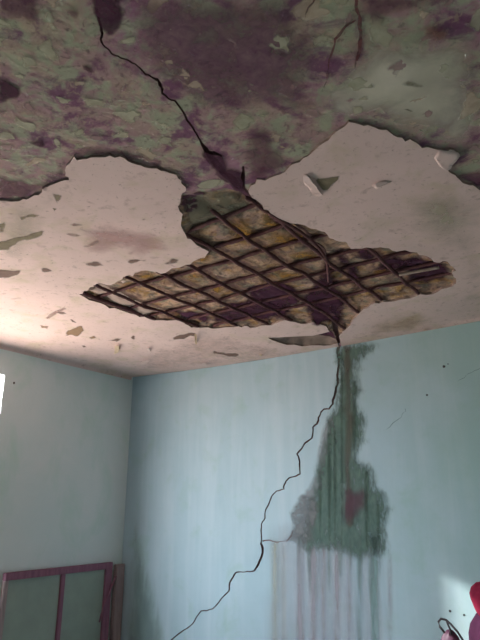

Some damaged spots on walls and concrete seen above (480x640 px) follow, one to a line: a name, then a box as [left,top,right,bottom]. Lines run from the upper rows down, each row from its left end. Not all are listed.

water stain [0,80,20,102]
water stain [2,0,36,21]
water stain [93,0,122,35]
crack [97,18,222,156]
water stain [144,8,311,105]
crack [323,0,362,88]
water stain [335,52,464,135]
peeling [0,0,480,345]
crack [241,166,252,198]
crack [295,224,332,289]
crack [171,313,341,640]
water stain [290,343,388,640]